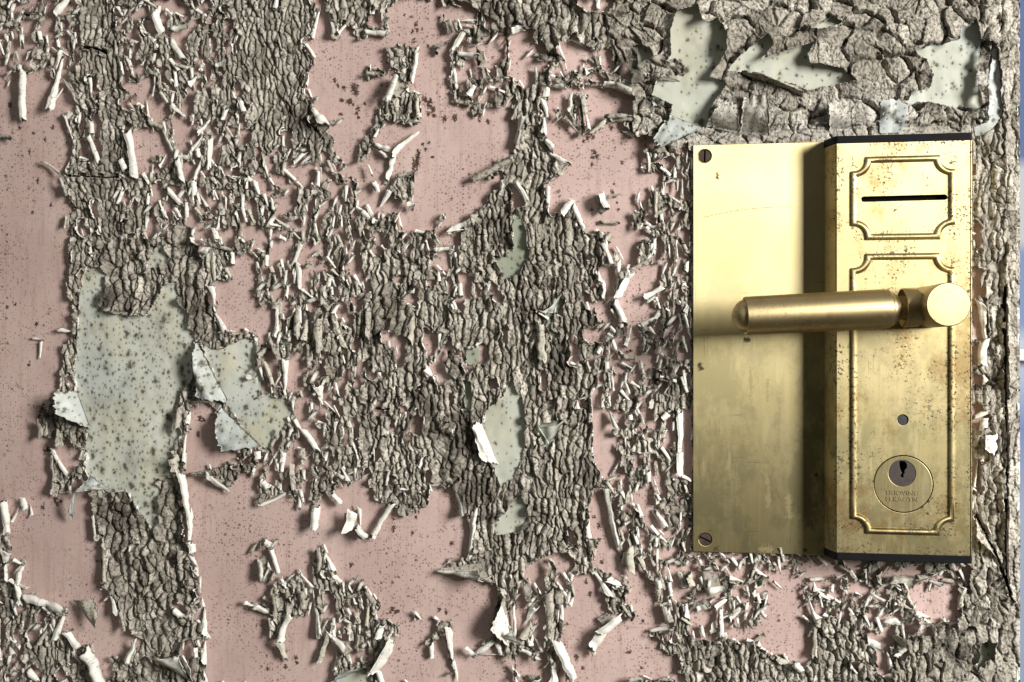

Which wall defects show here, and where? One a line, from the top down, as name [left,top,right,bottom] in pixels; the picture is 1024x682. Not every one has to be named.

peeling [0,0,638,682]
peeling [338,0,1021,682]